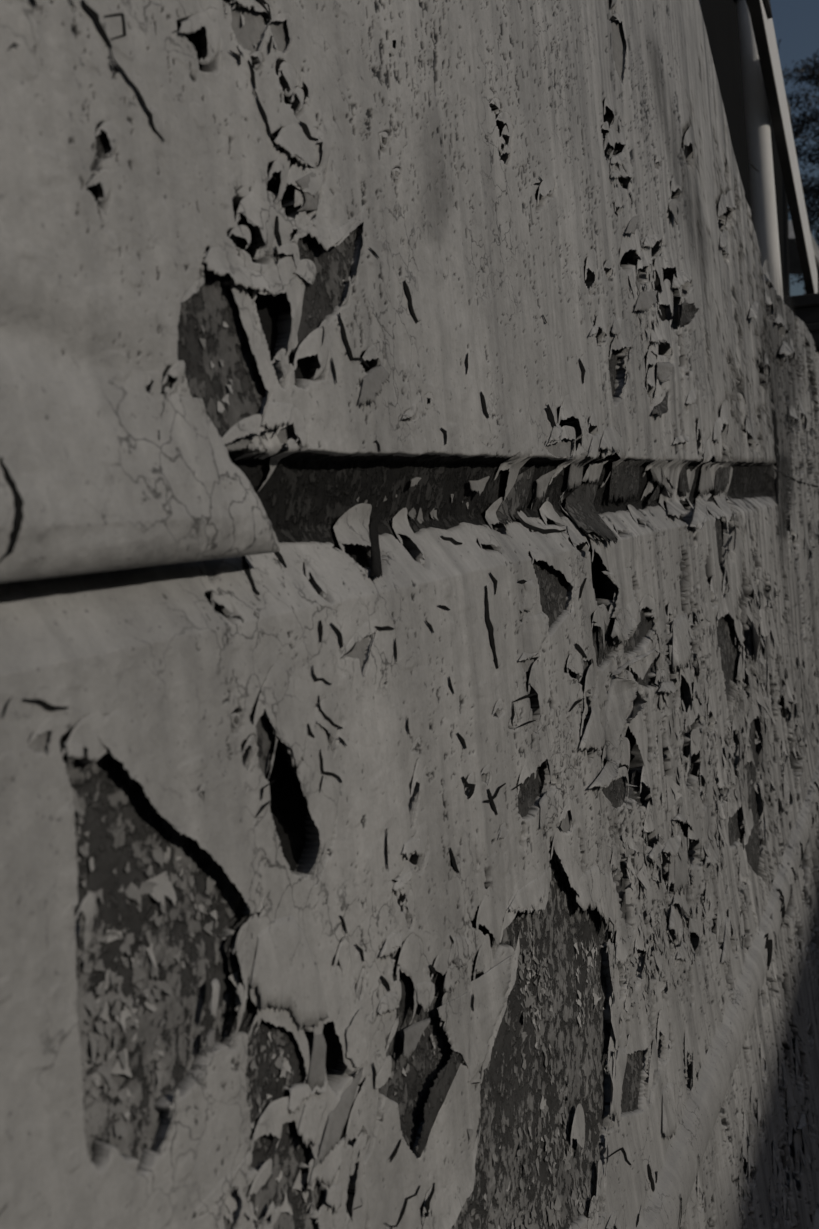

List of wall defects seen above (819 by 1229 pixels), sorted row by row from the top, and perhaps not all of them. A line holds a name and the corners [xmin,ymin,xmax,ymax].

peeling [85,121,119,202]
peeling [489,98,513,164]
peeling [145,0,390,494]
peeling [585,93,699,417]
peeling [716,190,736,258]
peeling [748,260,795,383]
spalling [60,386,819,1229]